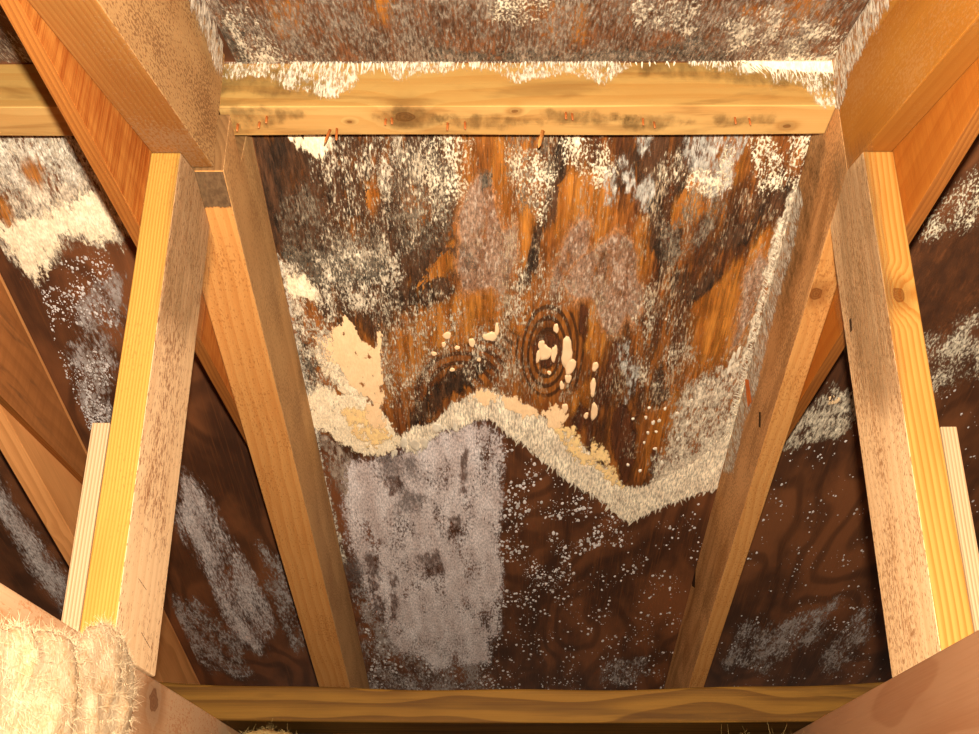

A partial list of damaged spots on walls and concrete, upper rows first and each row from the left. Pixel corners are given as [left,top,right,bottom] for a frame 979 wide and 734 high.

leakage [189,0,889,108]
leakage [0,136,130,431]
leakage [252,134,811,690]
leakage [782,162,893,469]
leakage [910,168,979,399]
leakage [172,474,306,680]
leakage [720,585,884,687]